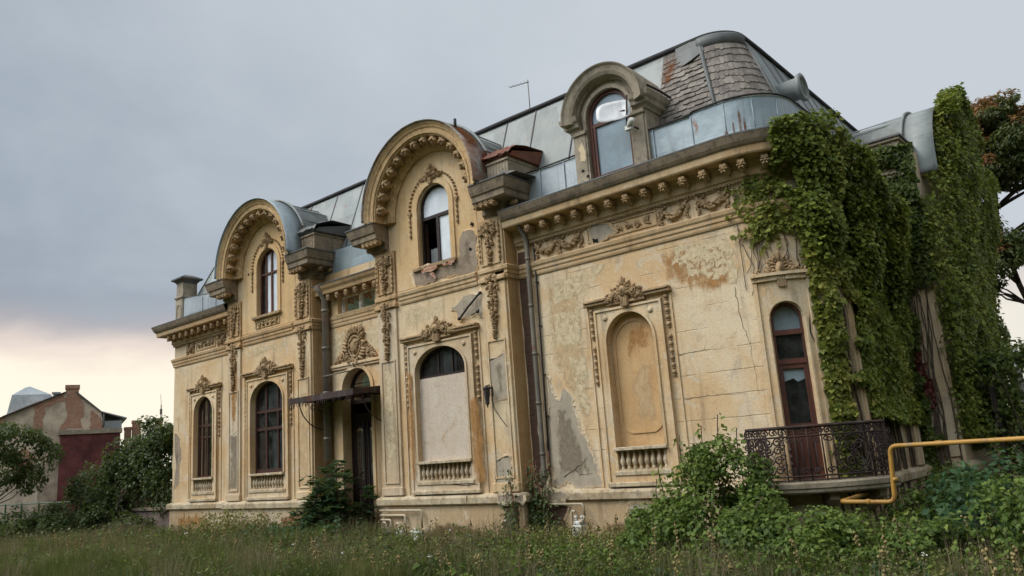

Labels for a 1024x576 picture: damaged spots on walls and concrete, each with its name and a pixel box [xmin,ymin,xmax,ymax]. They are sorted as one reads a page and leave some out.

flaking render [410,222,479,288]
peeling [671,232,738,285]
flaking render [519,263,604,535]
crack [685,287,758,400]